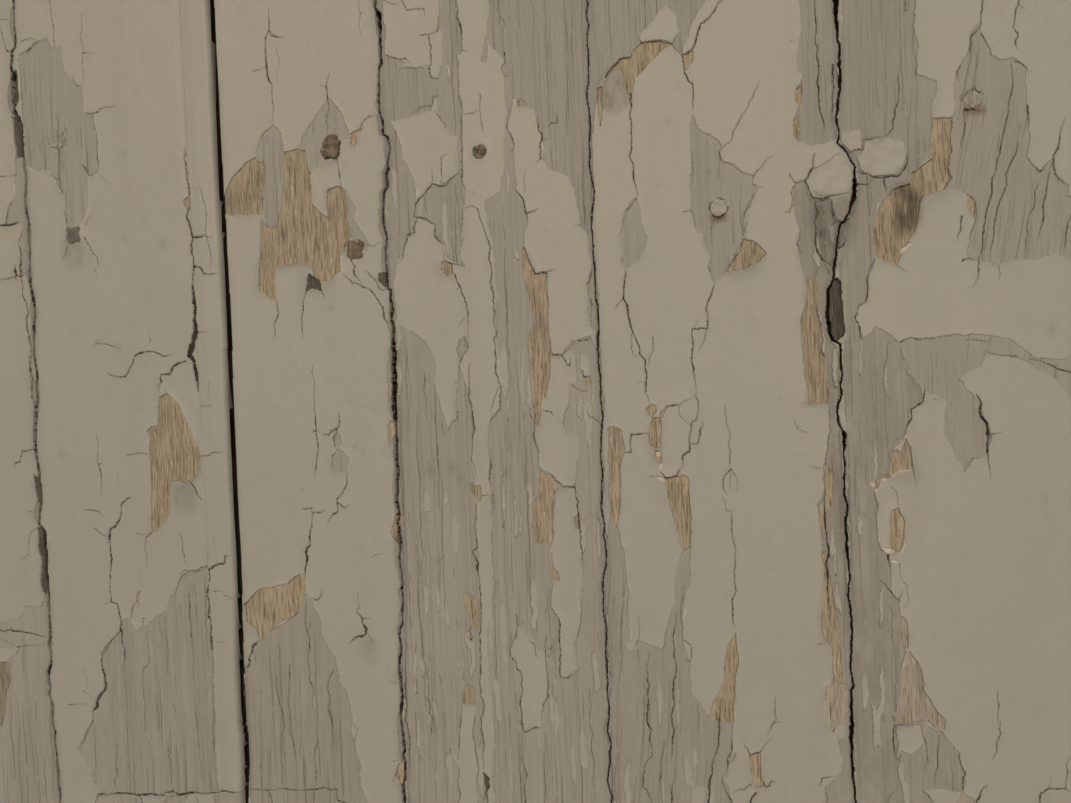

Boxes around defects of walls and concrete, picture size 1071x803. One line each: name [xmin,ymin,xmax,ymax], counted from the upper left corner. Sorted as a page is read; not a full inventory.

peeling [7,0,99,431]
crack [93,152,218,408]
peeling [146,393,202,533]
crack [69,365,360,803]
peeling [76,567,369,803]
peeling [224,0,768,803]
crack [343,0,739,803]
crack [707,697,781,803]
crack [794,403,832,645]
crack [742,0,910,267]
peeling [792,0,1071,803]
crack [952,366,1002,480]